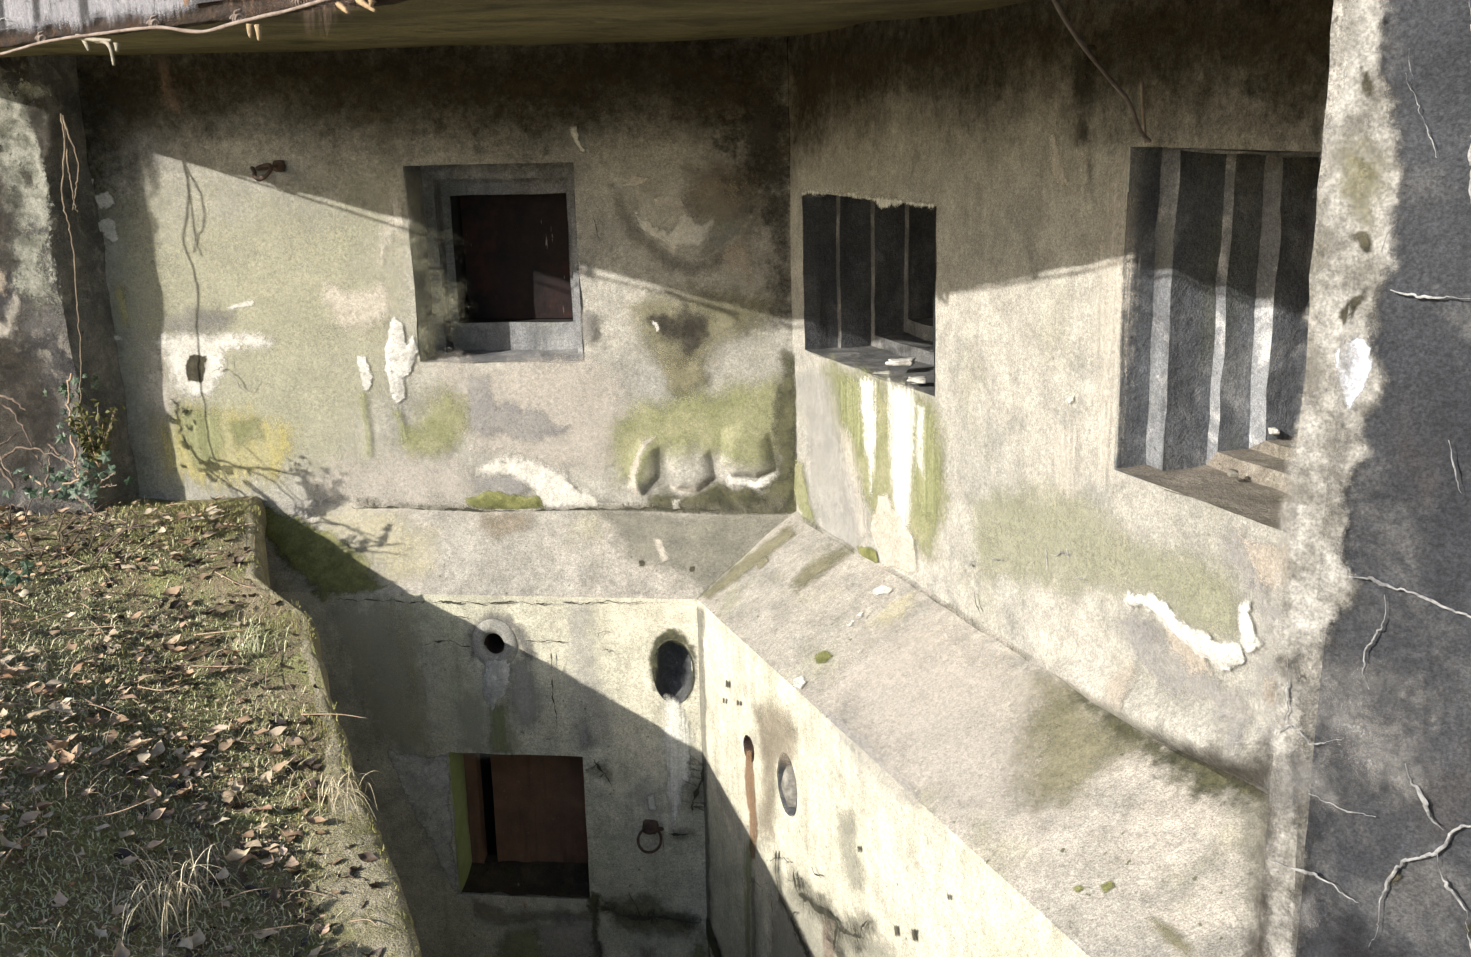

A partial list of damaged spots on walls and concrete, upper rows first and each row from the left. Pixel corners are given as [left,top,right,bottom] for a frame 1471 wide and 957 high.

water stain [76,0,1334,316]
peeling [143,330,273,410]
water stain [118,211,390,467]
peeling [325,285,418,404]
peeling [316,377,598,508]
water stain [837,376,940,537]
spalling [1222,0,1403,957]
crack [1390,290,1471,299]
crack [1349,576,1471,689]
corrosion [744,750,757,957]
water stain [835,622,1304,957]
crack [1269,763,1471,948]